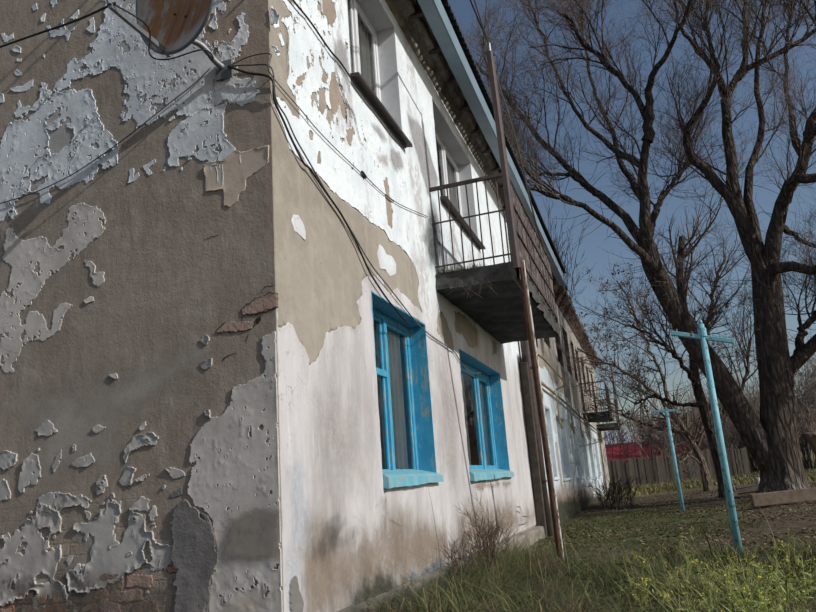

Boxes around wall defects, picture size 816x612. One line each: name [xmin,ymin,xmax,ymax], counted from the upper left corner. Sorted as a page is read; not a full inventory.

leakage [408,116,437,193]
leakage [427,212,441,265]
peeling [0,0,421,612]
leakage [309,529,446,603]